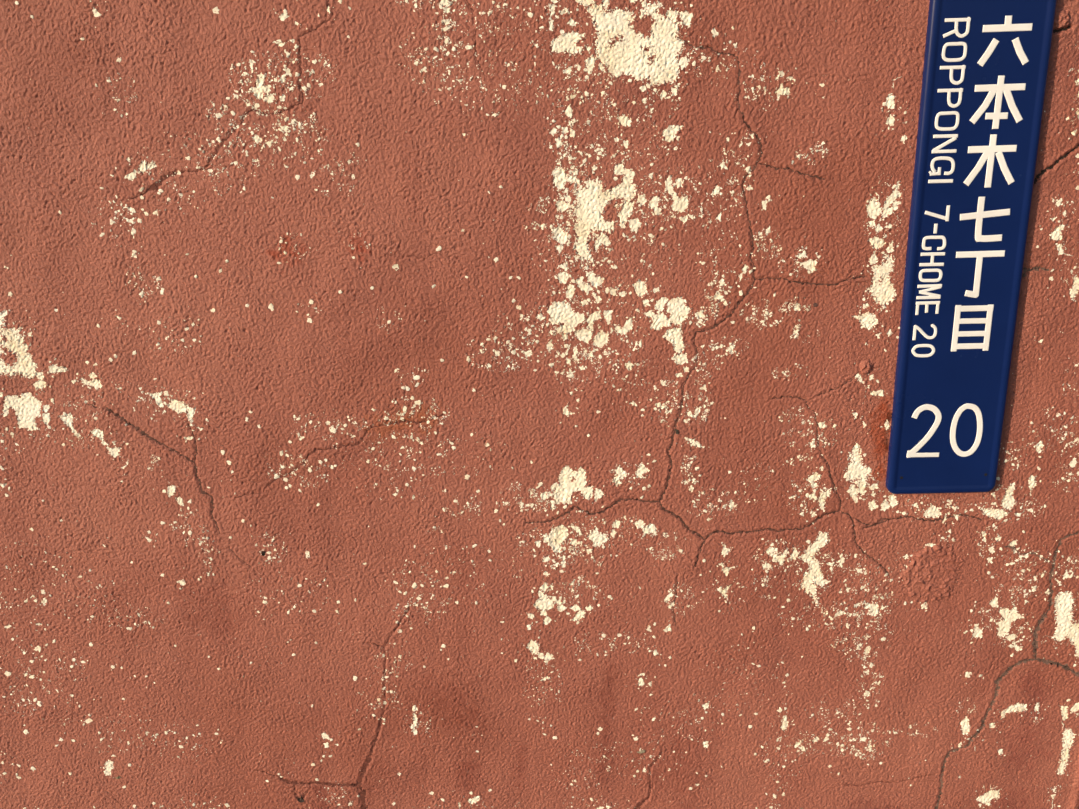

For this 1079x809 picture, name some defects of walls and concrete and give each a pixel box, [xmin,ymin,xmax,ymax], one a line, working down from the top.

peeling [0,292,220,580]
peeling [91,39,360,302]
crack [88,404,443,567]
peeling [268,367,491,501]
peeling [395,0,826,521]
crack [526,37,982,627]
peeling [852,173,904,352]
peeling [1040,154,1079,302]
peeling [0,544,223,788]
crack [255,609,409,809]
peeling [353,453,769,809]
crack [841,531,1079,809]